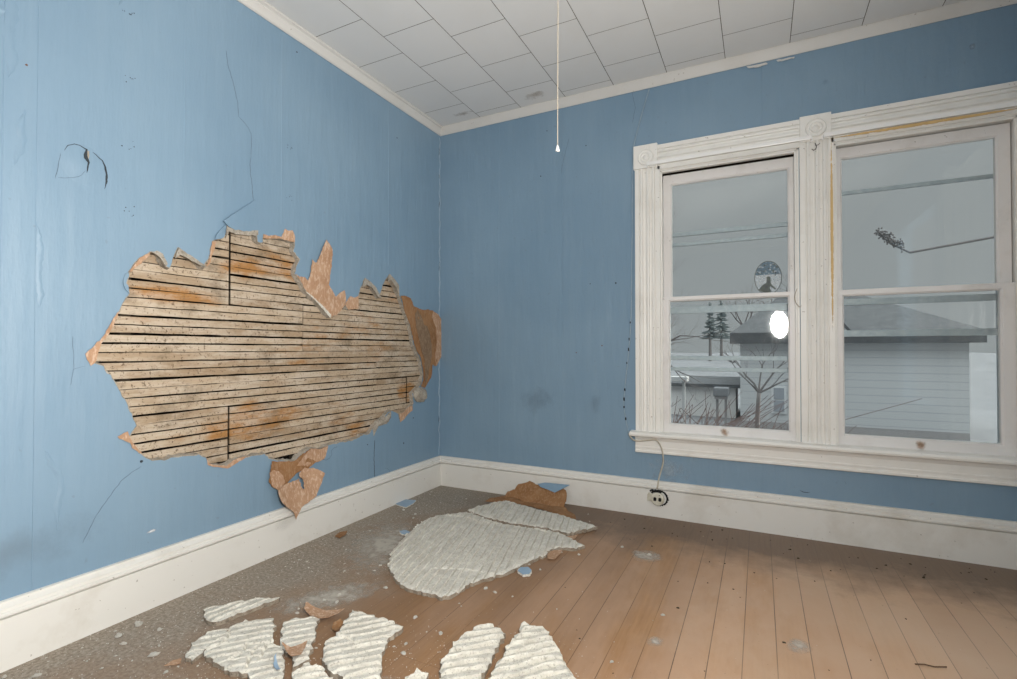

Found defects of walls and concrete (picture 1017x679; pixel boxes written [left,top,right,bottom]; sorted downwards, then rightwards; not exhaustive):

spalling [85,226,441,468]